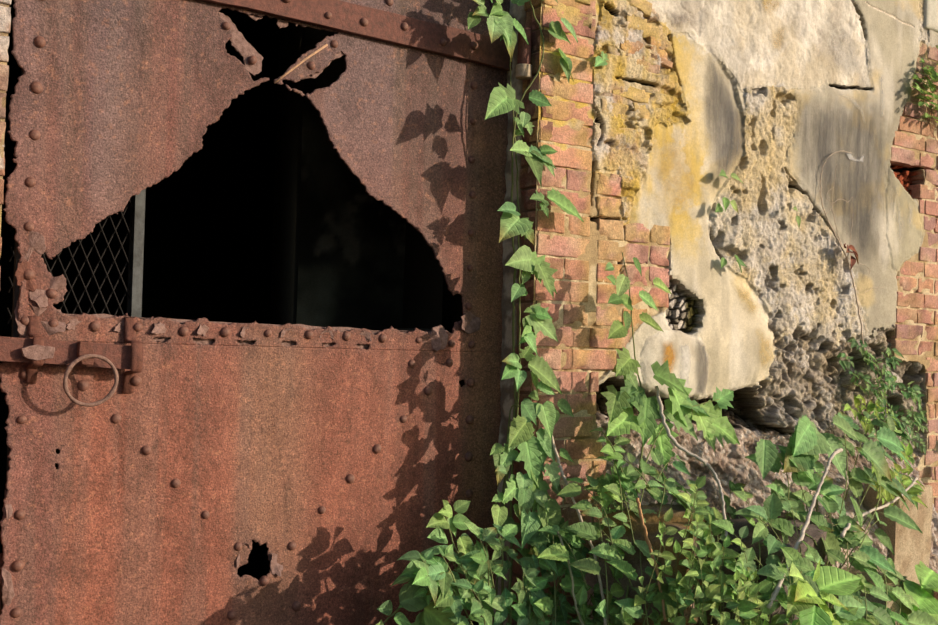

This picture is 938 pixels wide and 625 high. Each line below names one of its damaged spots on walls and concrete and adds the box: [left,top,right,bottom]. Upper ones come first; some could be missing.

crack [851,0,915,40]
spalling [918,0,930,43]
crack [615,33,682,87]
crack [829,83,873,91]
damp [805,114,880,251]
spalling [552,0,928,569]
corrosion [14,261,82,360]
corrosion [430,325,448,351]
corrosion [5,490,13,521]
spalling [925,504,938,574]
corrosion [270,553,283,576]
corrosion [1,568,15,606]